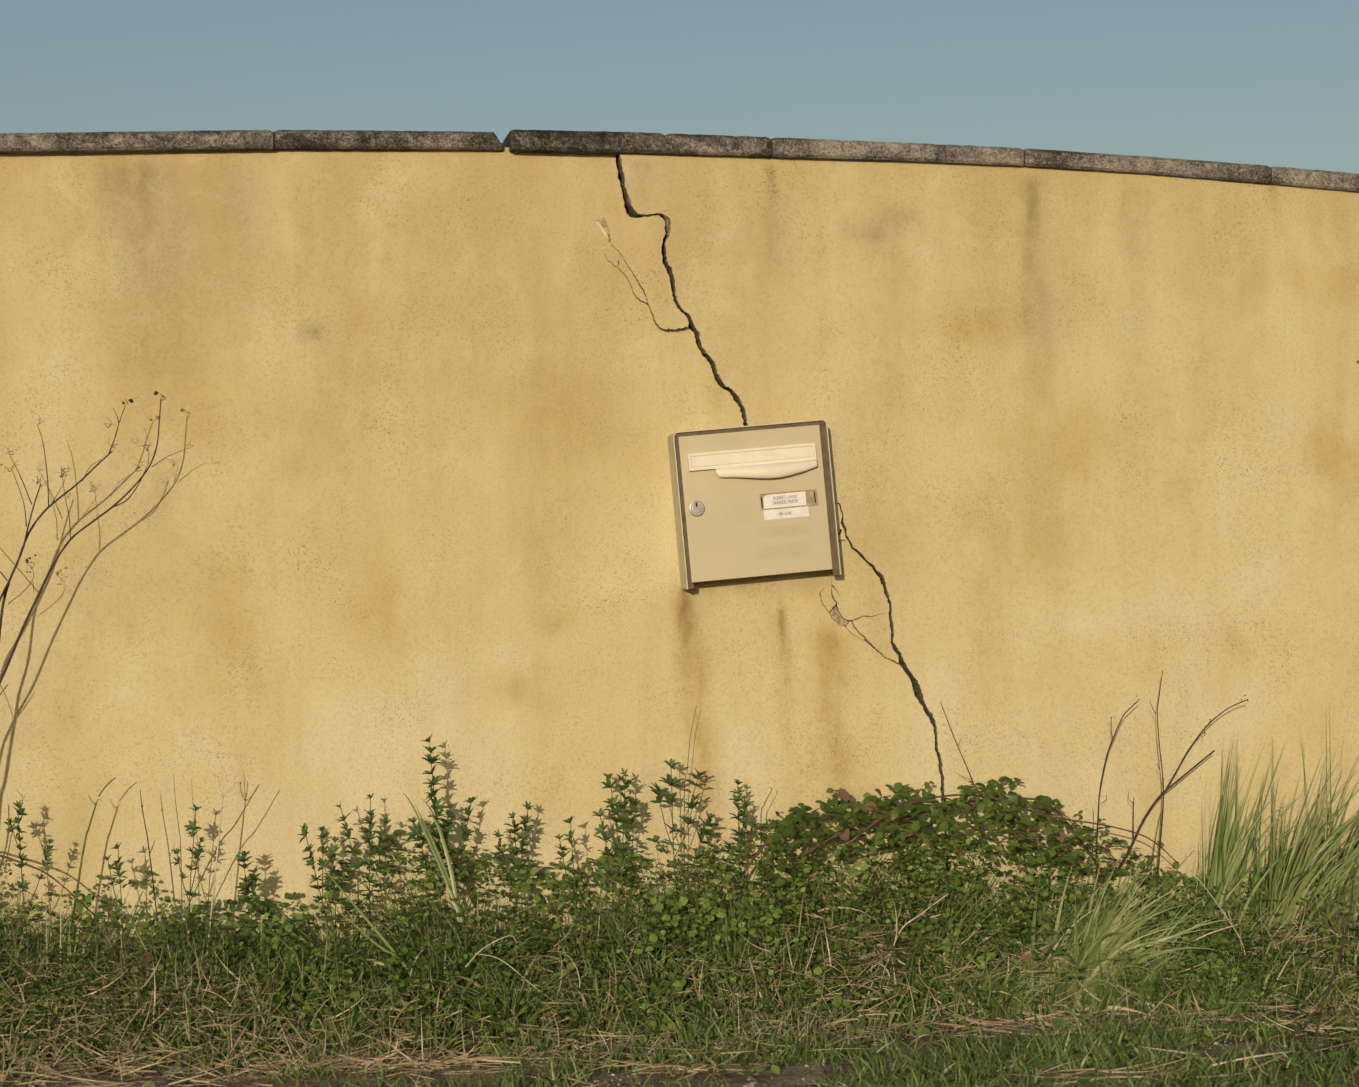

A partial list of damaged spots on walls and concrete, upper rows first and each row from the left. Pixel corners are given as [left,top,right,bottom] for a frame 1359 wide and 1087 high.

peeling [595,212,689,331]
crack [616,154,748,426]
peeling [819,569,899,663]
crack [837,503,951,909]